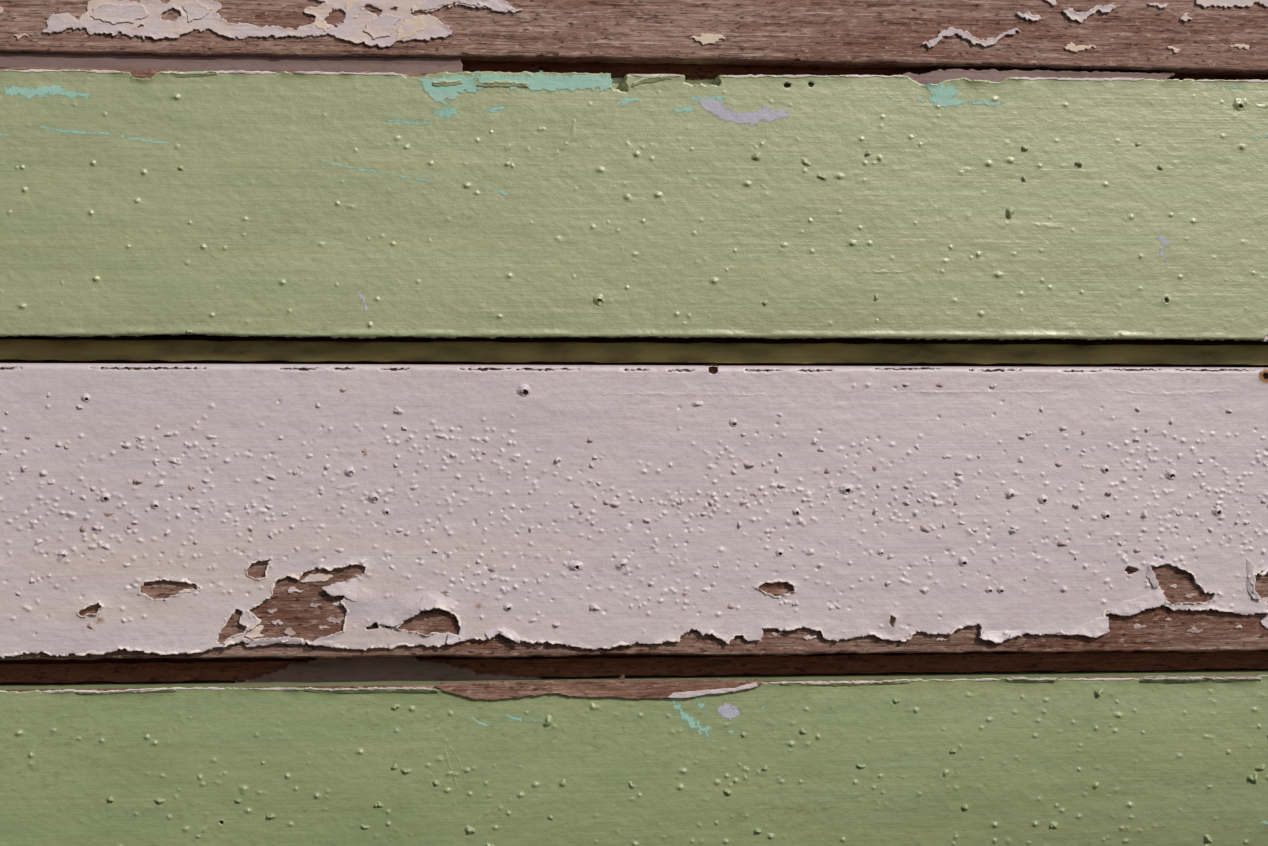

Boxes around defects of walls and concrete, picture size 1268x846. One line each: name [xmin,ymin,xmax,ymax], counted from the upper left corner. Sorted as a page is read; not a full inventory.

peeling [42,0,522,48]
peeling [690,33,725,46]
peeling [922,11,1041,48]
peeling [1064,42,1096,52]
peeling [1045,0,1116,23]
peeling [1180,0,1268,22]
peeling [0,557,1268,659]
spalling [303,679,762,740]